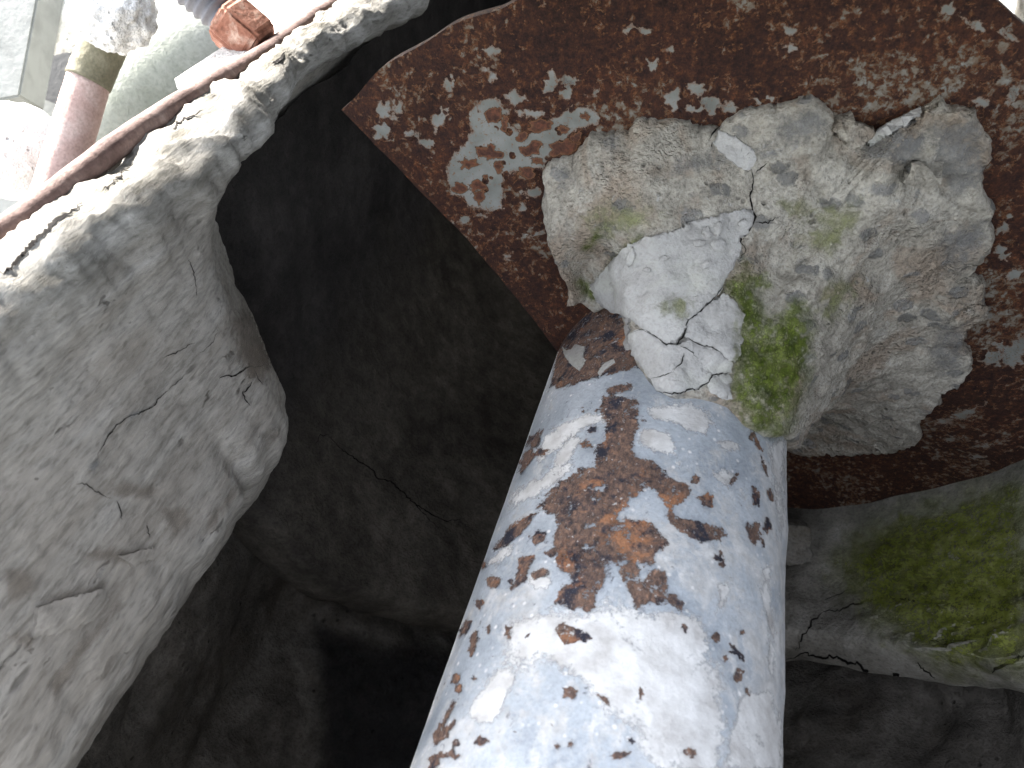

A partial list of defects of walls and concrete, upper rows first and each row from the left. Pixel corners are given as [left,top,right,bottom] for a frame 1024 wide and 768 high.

peeling [663,81,779,170]
spalling [832,106,922,150]
crack [0,165,131,275]
peeling [562,344,586,371]
spalling [589,208,754,400]
crack [640,285,728,395]
rust [481,308,728,633]
rust [746,431,774,548]
rust [555,622,592,645]
crack [786,584,968,678]
crack [992,655,1024,673]
rust [428,673,477,768]